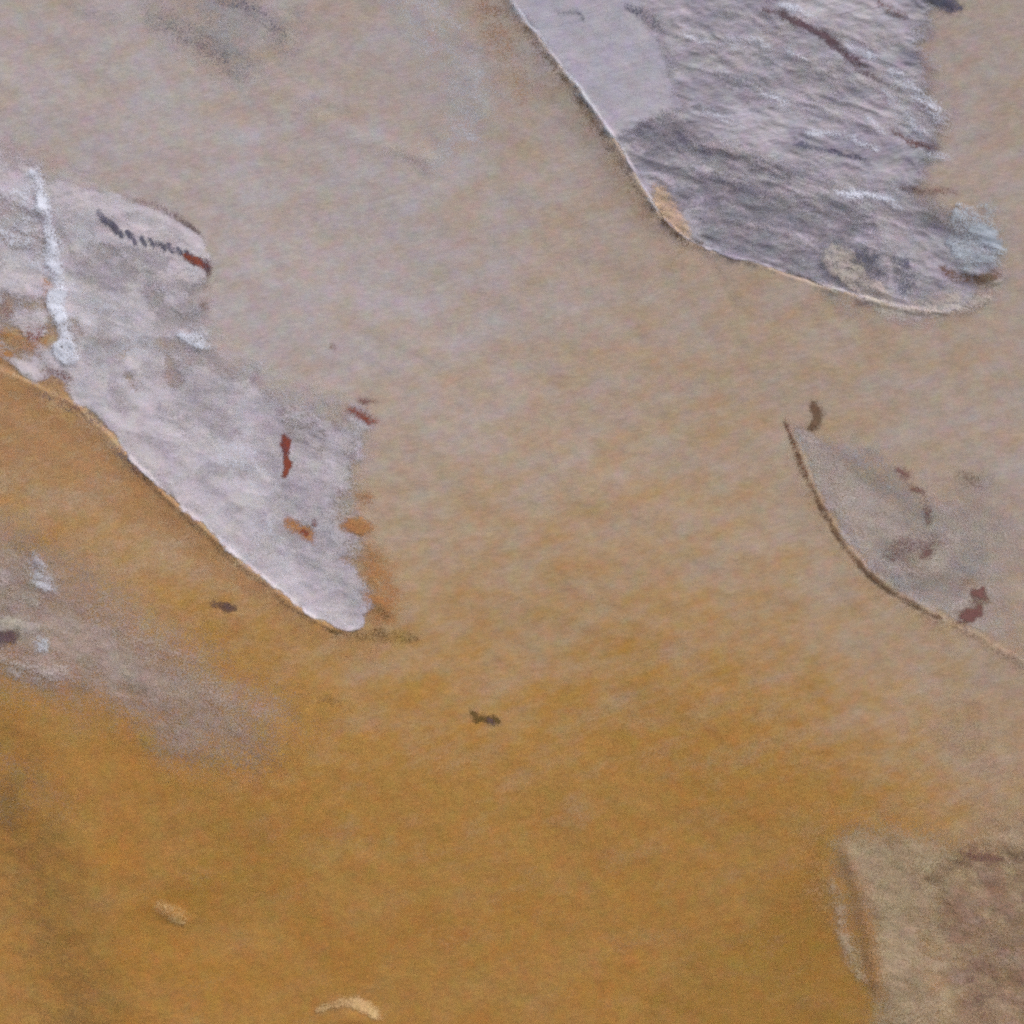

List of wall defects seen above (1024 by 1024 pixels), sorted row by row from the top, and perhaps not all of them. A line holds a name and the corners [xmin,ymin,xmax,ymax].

spalling [495,0,1008,330]
spalling [0,144,419,660]
corrosion [280,433,293,479]
corrosion [348,398,380,425]
peeling [793,400,1024,659]